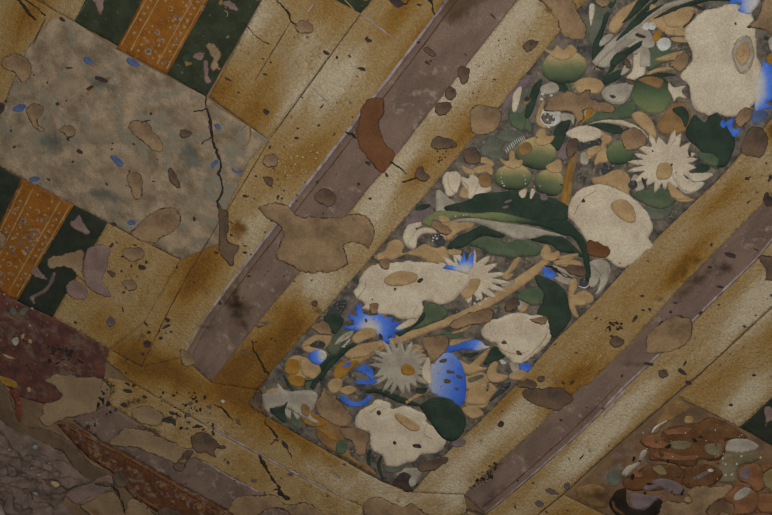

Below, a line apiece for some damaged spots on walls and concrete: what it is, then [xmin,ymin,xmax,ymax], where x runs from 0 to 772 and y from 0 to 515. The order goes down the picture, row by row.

flaking render [539,0,587,40]
crack [193,96,224,208]
flaking render [352,97,395,177]
flaking render [734,107,768,164]
flaking render [214,203,252,266]
flaking render [243,127,375,281]
flaking render [755,249,772,281]
flaking render [138,318,172,356]
crack [251,340,269,400]
flaking render [39,345,229,484]
flaking render [0,420,182,515]
crack [259,415,292,500]